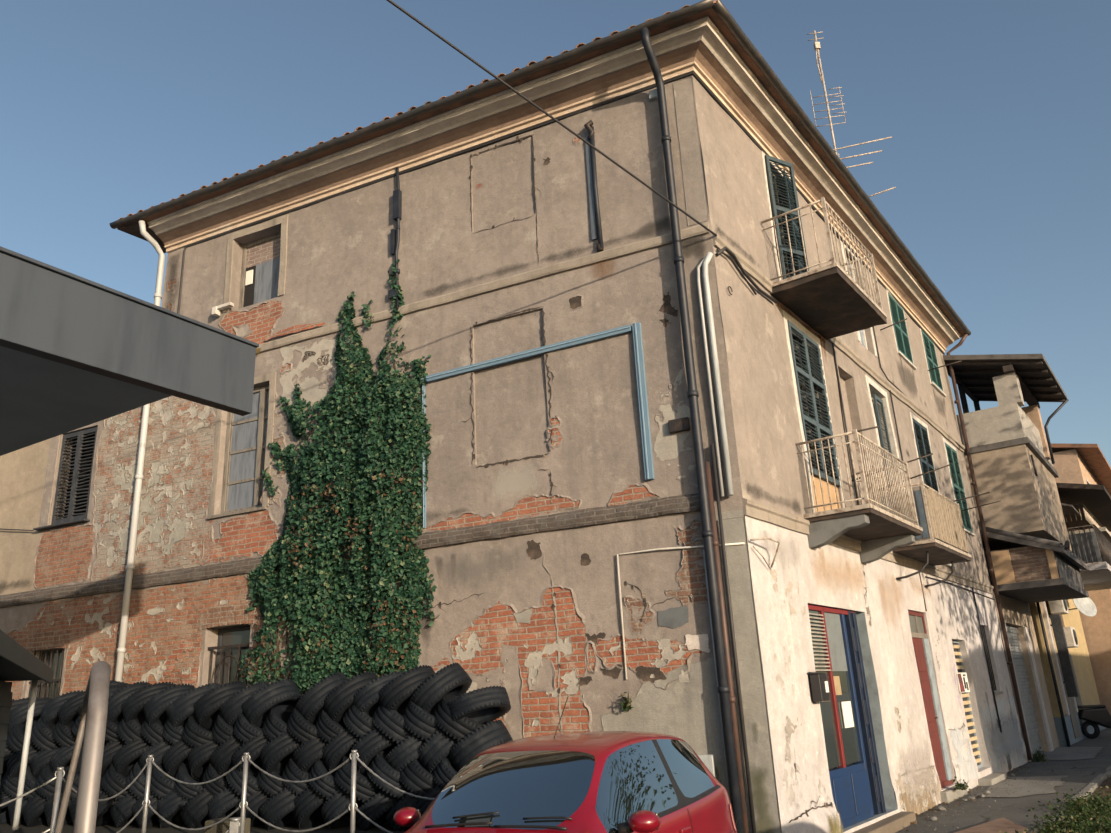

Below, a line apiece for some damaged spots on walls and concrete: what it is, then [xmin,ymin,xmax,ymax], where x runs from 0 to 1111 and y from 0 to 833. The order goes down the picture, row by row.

crack [469,134,541,263]
spalling [656,292,679,328]
crack [461,306,556,503]
peeling [653,363,698,488]
spalling [7,299,358,696]
spalling [417,493,582,534]
spalling [526,539,542,561]
spalling [607,482,661,507]
spalling [664,517,709,609]
spalling [5,681,25,700]
spalling [427,585,705,738]
crack [789,749,833,823]